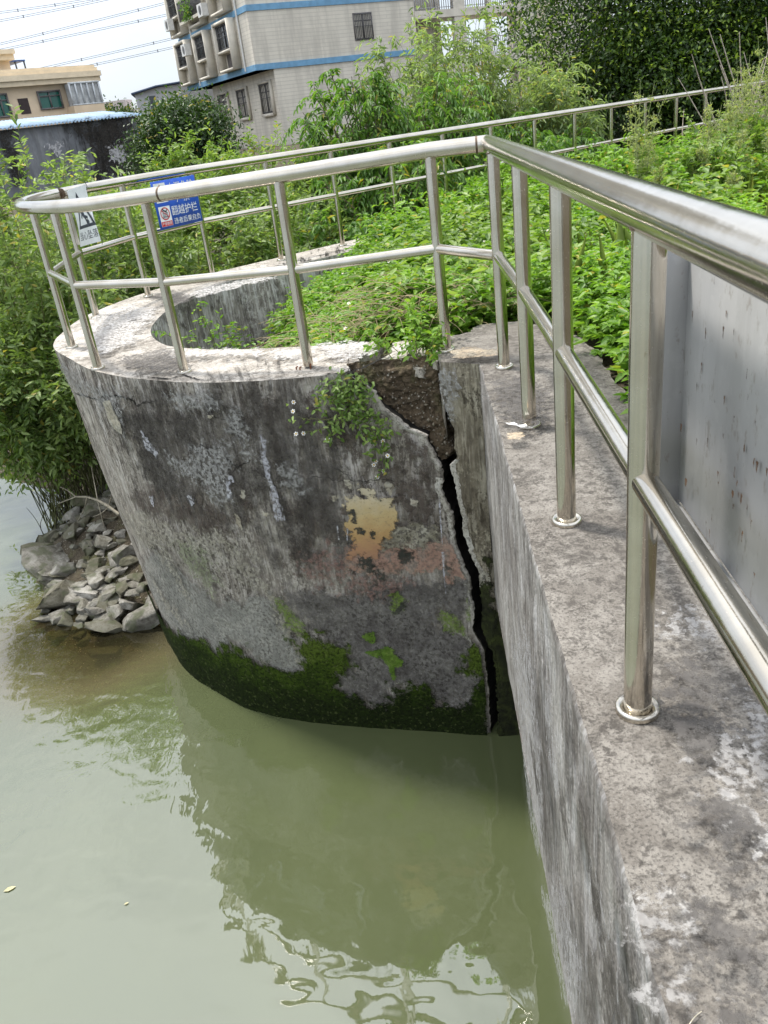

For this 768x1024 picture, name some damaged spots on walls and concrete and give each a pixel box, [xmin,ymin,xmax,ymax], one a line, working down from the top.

damp [104,361,483,709]
crack [327,354,499,732]